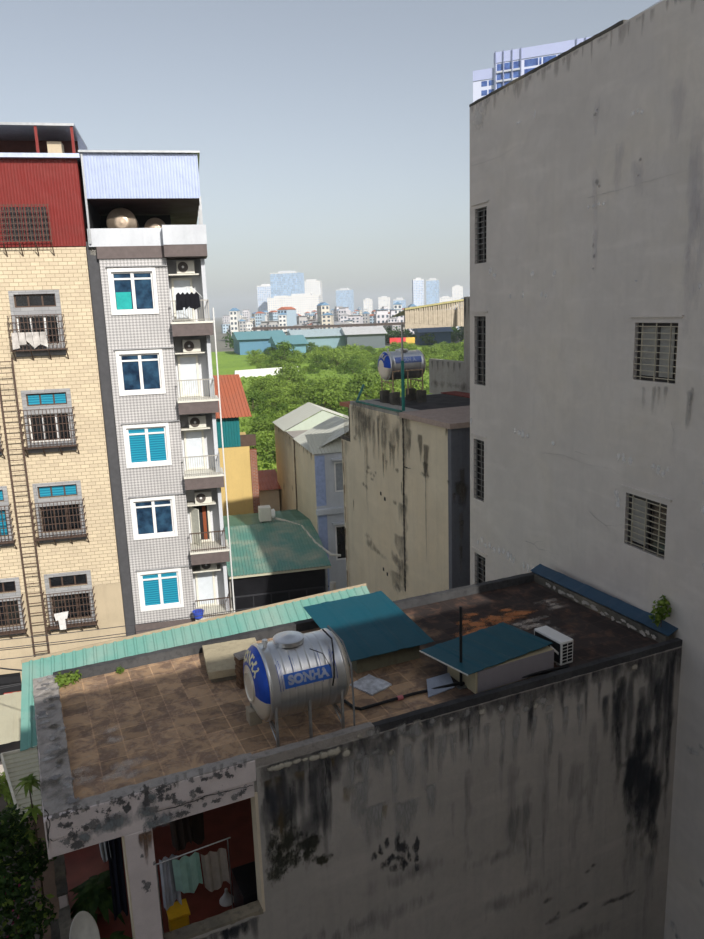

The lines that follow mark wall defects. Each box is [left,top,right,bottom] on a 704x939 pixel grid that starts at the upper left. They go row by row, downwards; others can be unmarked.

damp [418,436,428,473]
peeling [32,675,247,850]
damp [264,648,682,880]